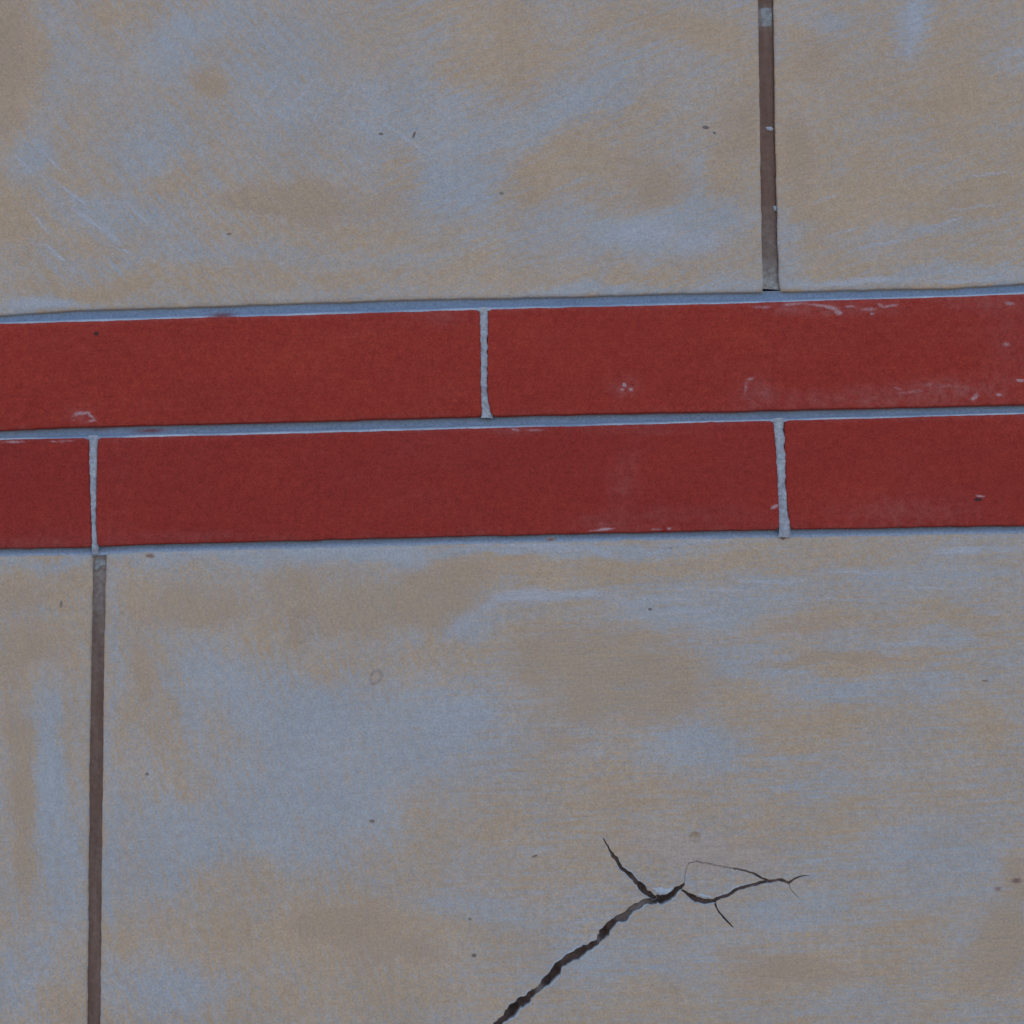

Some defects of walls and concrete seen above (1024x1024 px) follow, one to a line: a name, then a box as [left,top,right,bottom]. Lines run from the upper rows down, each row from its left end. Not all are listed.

crack [493,838,810,1024]